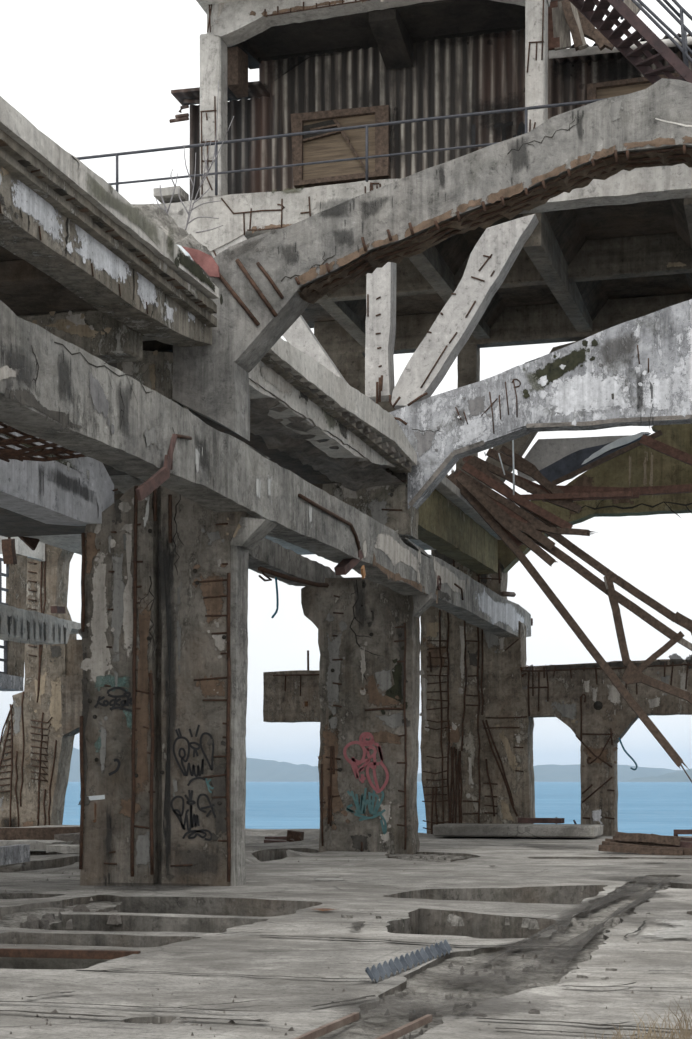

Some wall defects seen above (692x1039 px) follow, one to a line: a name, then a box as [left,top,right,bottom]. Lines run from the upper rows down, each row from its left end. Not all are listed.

spalling [200,96,292,235]
flaking render [0,160,206,326]
spalling [207,274,260,326]
spalling [231,249,284,317]
spalling [0,365,86,431]
spalling [249,366,408,511]
flaking render [376,332,457,465]
flaking render [454,321,692,448]
spalling [258,566,340,598]
flaking render [0,644,63,827]
spalling [78,486,172,876]
spalling [192,557,231,882]